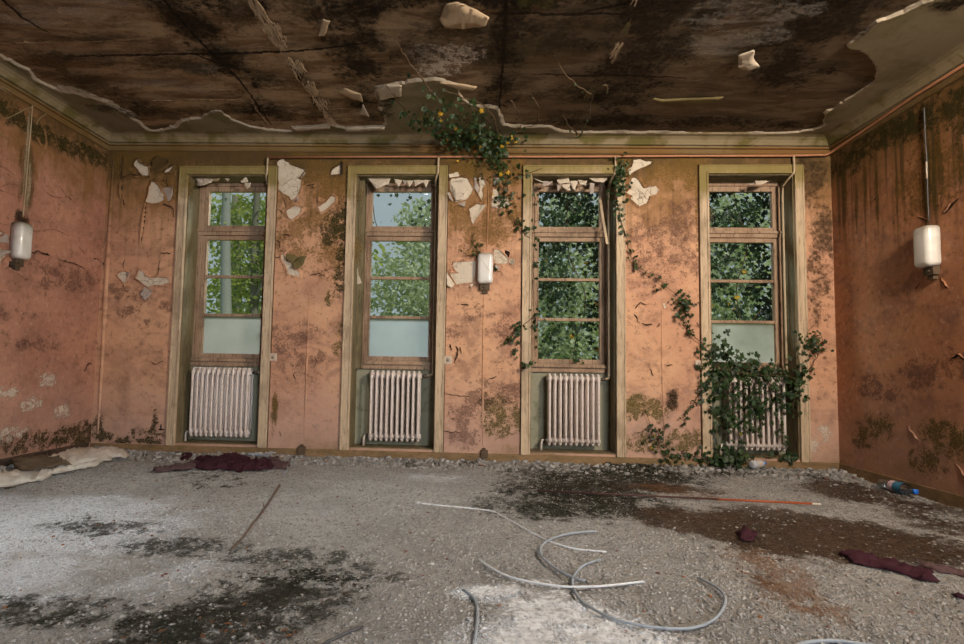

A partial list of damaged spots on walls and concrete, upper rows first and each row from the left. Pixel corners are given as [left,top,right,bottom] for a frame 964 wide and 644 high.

crack [0,0,369,126]
damp [11,0,817,130]
damp [730,0,914,93]
damp [0,99,192,211]
peeling [132,155,176,206]
peeling [274,158,338,222]
peeling [329,161,343,178]
peeling [447,172,513,227]
peeling [625,157,660,209]
damp [799,82,964,324]
peeling [446,258,478,288]
damp [666,390,678,410]